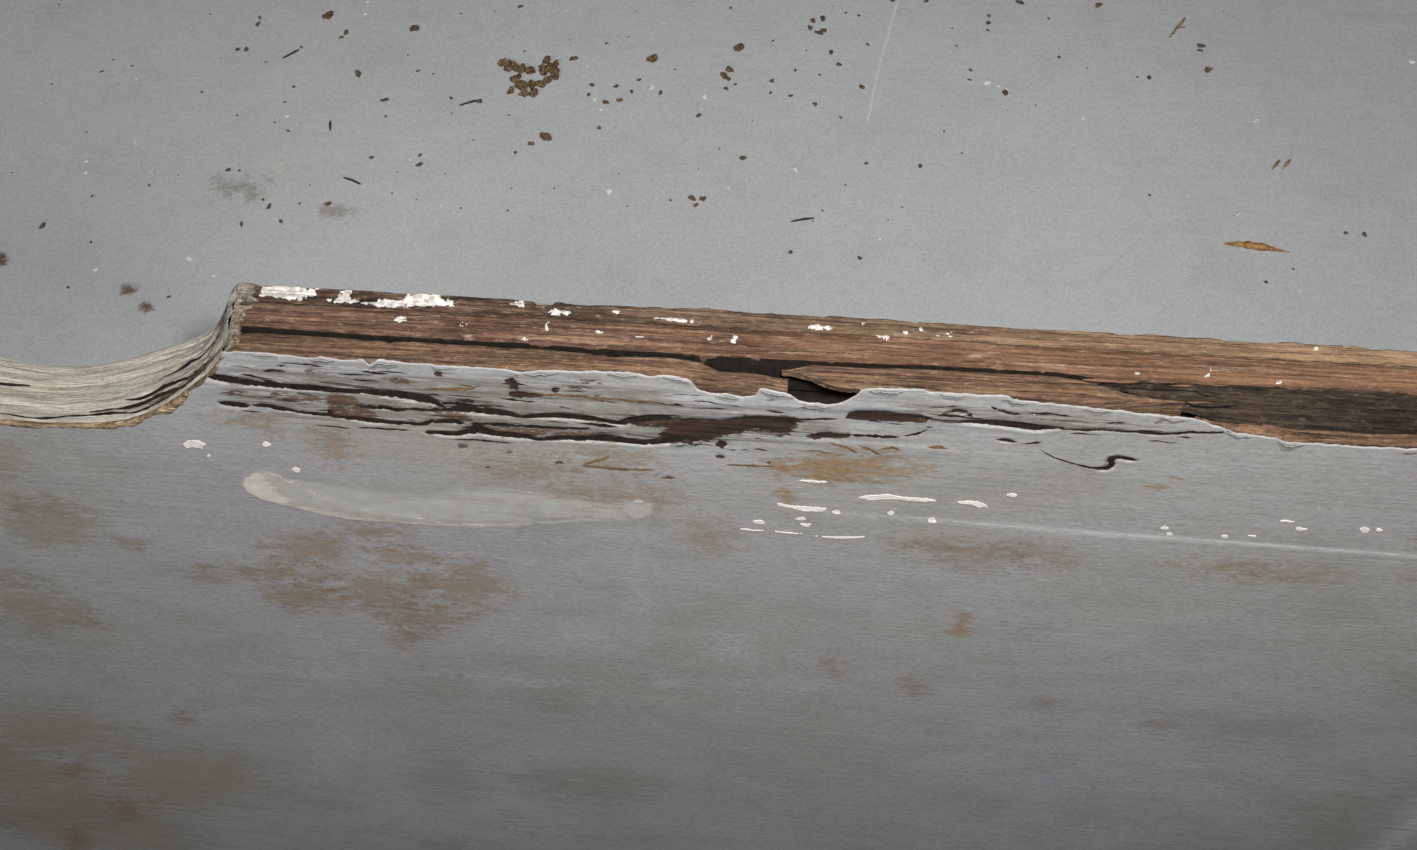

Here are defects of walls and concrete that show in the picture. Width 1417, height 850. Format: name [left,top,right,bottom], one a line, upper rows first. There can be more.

peeling [264,359,385,419]
peeling [505,372,637,398]
peeling [425,404,602,453]
peeling [616,390,932,458]